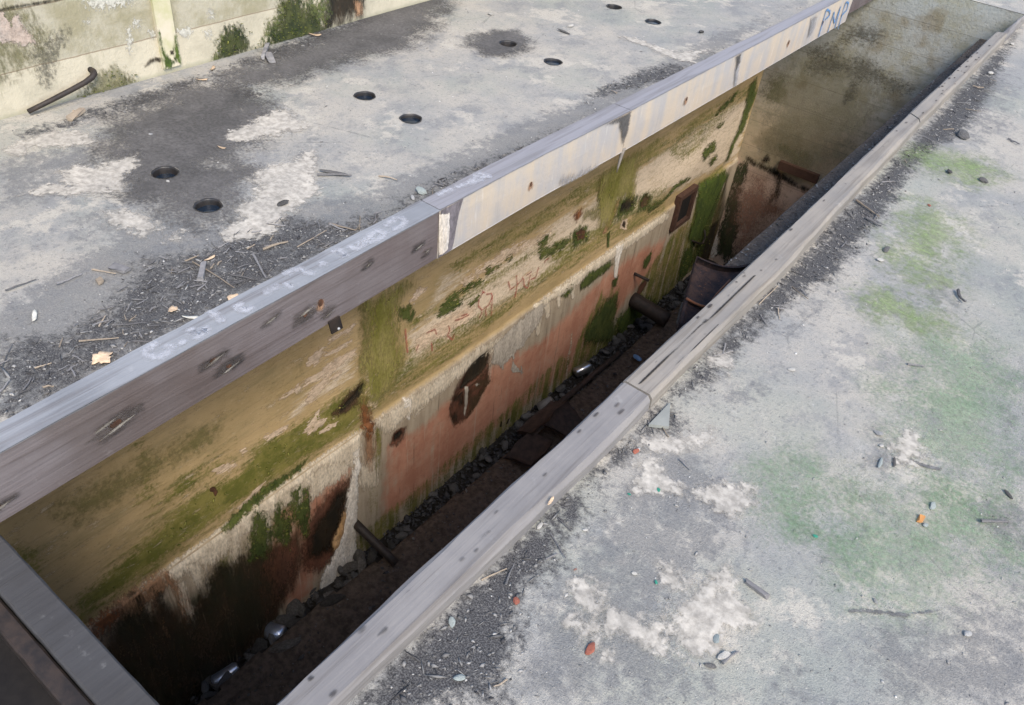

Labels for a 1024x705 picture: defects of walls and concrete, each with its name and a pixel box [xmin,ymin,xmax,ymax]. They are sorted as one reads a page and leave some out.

water stain [465,30,530,58]
water stain [677,155,809,282]
water stain [362,213,669,434]
rust [360,397,377,473]
spalling [449,352,491,426]
water stain [100,432,378,705]